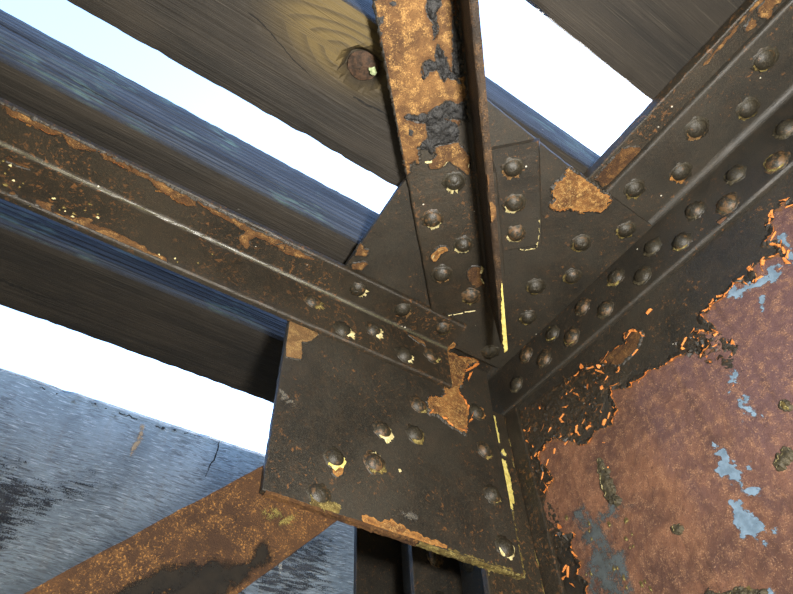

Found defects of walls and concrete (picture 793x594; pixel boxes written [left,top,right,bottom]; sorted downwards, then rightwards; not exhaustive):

corrosion [372,0,472,176]
corrosion [2,104,315,263]
corrosion [549,145,642,215]
corrosion [284,321,319,361]
peeling [674,329,738,369]
corrosion [425,341,480,436]
corrosion [536,197,793,594]
peeling [519,359,632,587]
peeling [773,445,793,471]
peeling [670,523,684,535]
peeling [704,585,769,594]